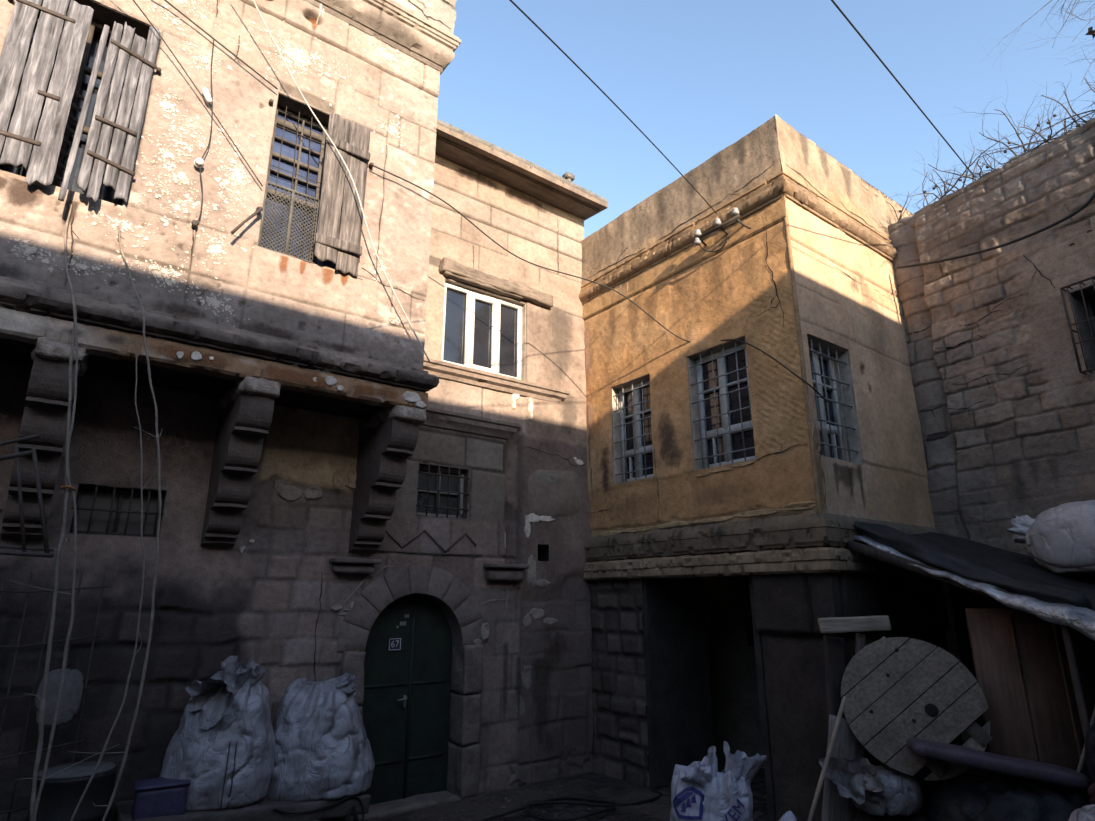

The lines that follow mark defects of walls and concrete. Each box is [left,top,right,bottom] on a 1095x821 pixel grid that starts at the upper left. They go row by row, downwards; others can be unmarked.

damp [0,177,42,204]
damp [65,201,78,222]
corrosion [324,269,348,284]
crack [758,230,784,323]
damp [159,304,204,317]
damp [248,323,293,338]
flaking render [176,351,214,362]
flaking render [313,376,344,392]
damp [660,417,680,465]
flaking render [524,513,556,538]
flaking render [526,555,550,588]